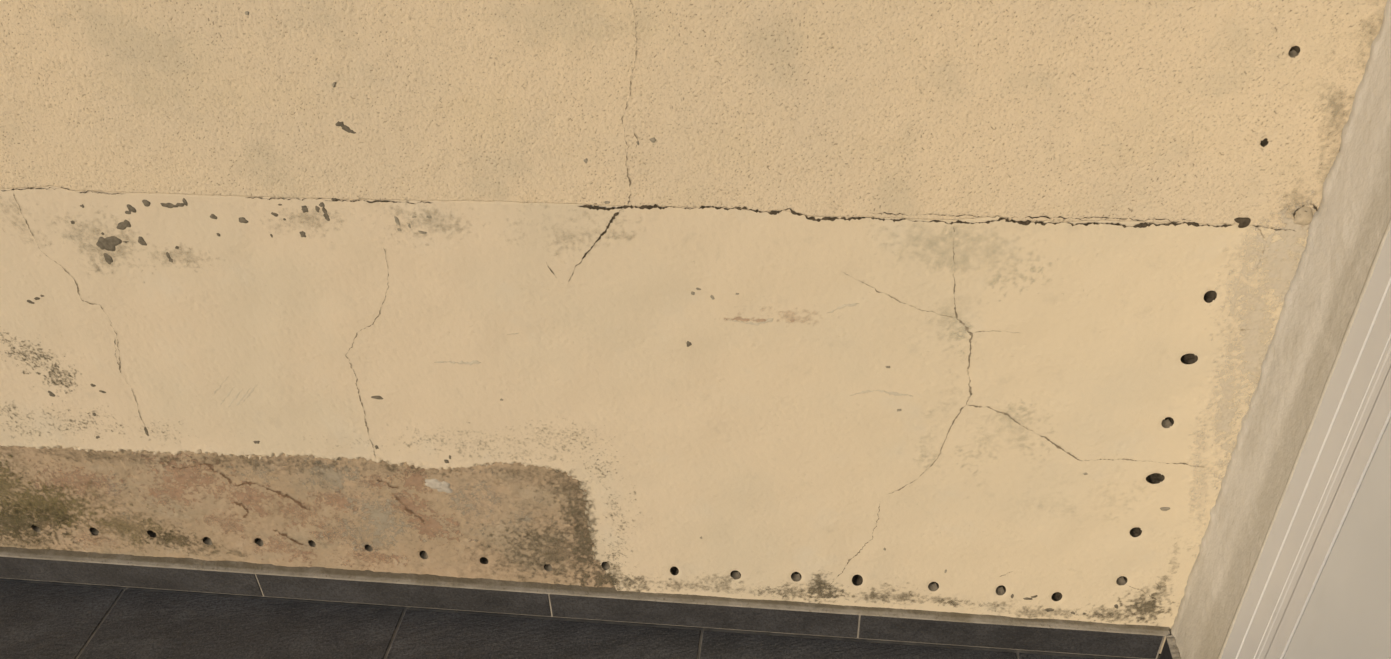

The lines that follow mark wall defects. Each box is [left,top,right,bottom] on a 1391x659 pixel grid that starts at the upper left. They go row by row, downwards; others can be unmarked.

crack [248,196,430,204]
crack [548,0,1297,584]
spalling [0,427,615,588]